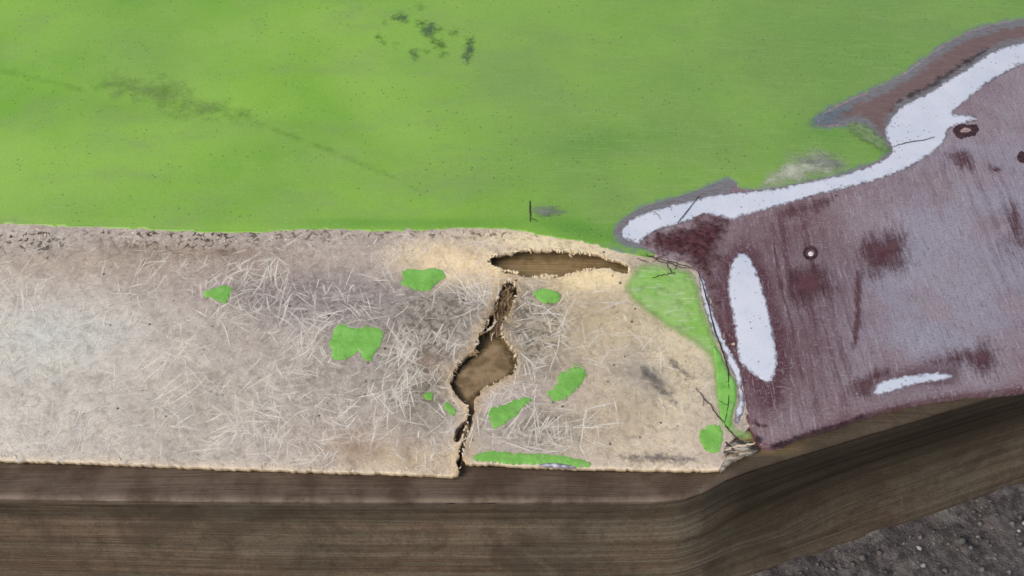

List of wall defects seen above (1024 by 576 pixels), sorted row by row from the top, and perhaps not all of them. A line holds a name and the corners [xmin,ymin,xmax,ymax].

damp [897,51,985,103]
damp [950,151,972,169]
damp [1008,206,1024,247]
crack [452,276,518,475]